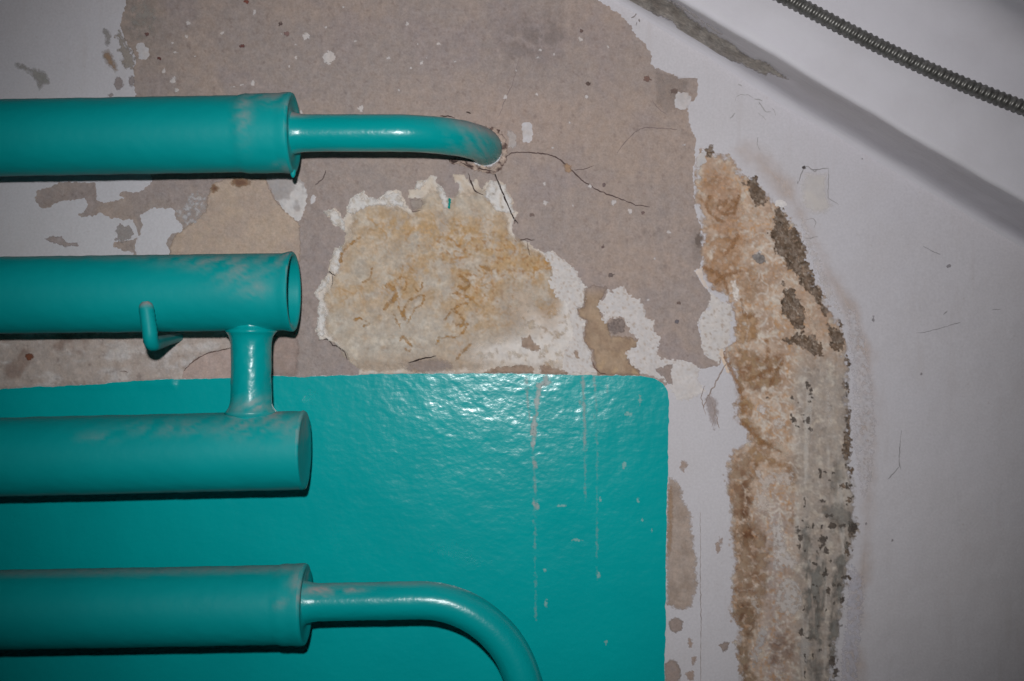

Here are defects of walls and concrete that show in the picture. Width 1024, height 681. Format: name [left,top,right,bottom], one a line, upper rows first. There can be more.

peeling [35,0,734,401]
crack [468,152,648,255]
peeling [666,479,698,633]
damp [695,149,876,681]